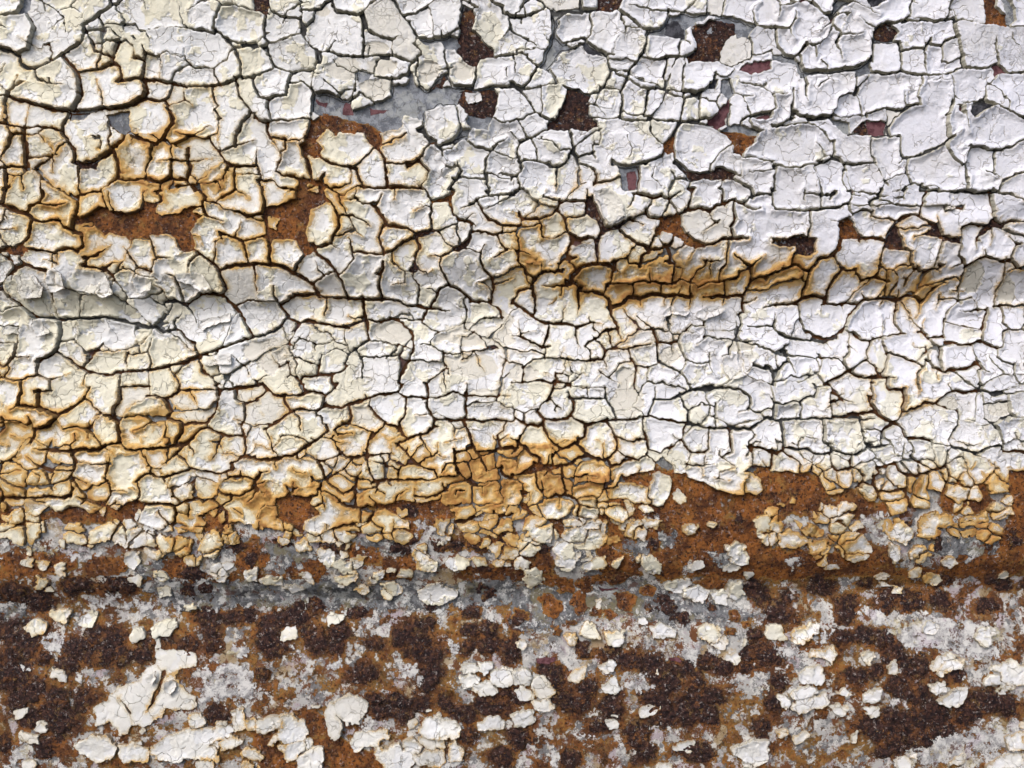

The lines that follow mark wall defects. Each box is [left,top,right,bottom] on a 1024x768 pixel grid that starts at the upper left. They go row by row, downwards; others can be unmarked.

rust [0,61,404,291]
crack [0,0,1024,540]
peeling [0,0,1024,606]
rust [494,196,964,327]
peeling [23,607,99,638]
crack [124,686,160,714]
peeling [73,602,465,768]
peeling [458,661,556,731]
rust [0,362,1024,768]
peeling [563,620,626,695]
peeling [764,621,883,719]
peeling [927,651,968,708]